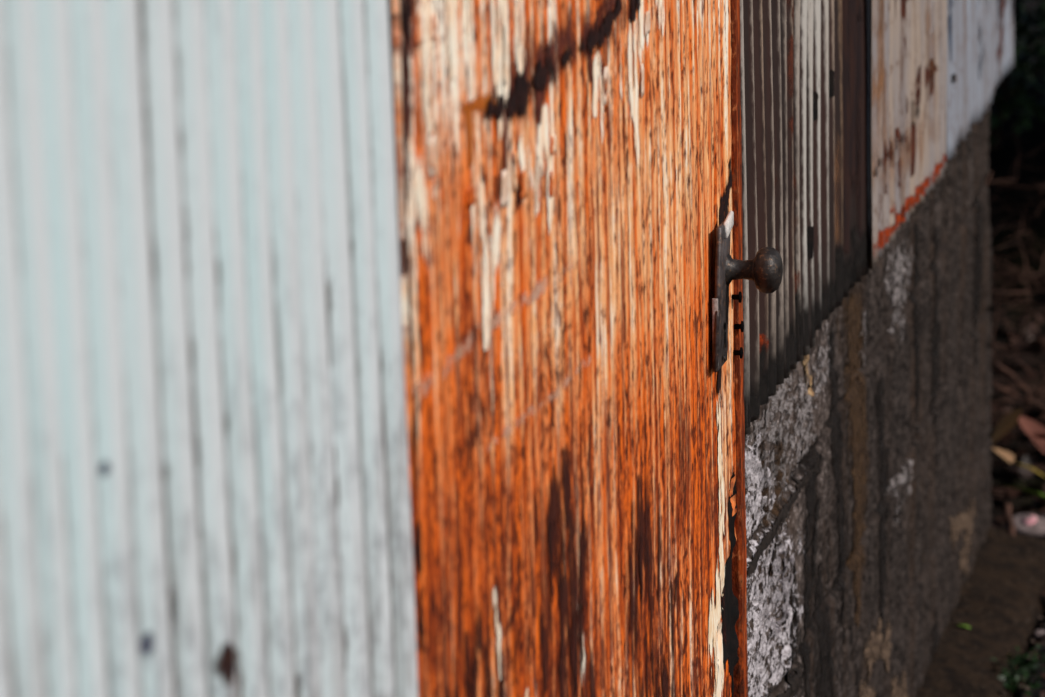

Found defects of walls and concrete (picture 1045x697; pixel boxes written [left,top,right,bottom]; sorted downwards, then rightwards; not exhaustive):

rust [400,0,426,656]
peeling [412,0,472,259]
peeling [491,0,525,140]
peeling [468,104,557,351]
rust [462,0,641,210]
peeling [593,0,665,166]
rust [720,158,732,224]
rust [842,0,946,254]
rust [215,642,236,686]
rust [535,449,596,697]
rust [623,476,686,697]
peeling [708,403,725,697]